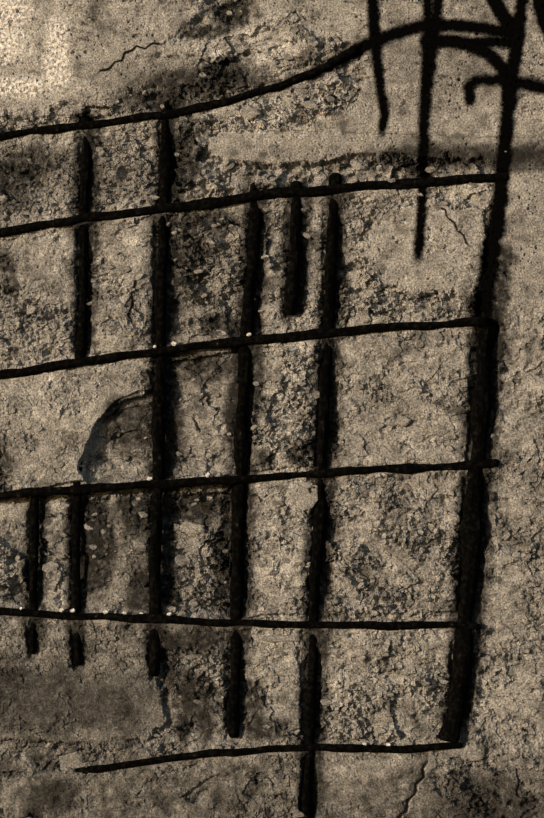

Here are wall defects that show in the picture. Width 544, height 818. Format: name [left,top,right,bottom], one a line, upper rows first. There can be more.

spalling [0,219,79,370]
crack [98,42,162,73]
spalling [86,202,249,480]
spalling [0,0,495,334]
spalling [0,312,544,818]
crack [397,760,427,818]